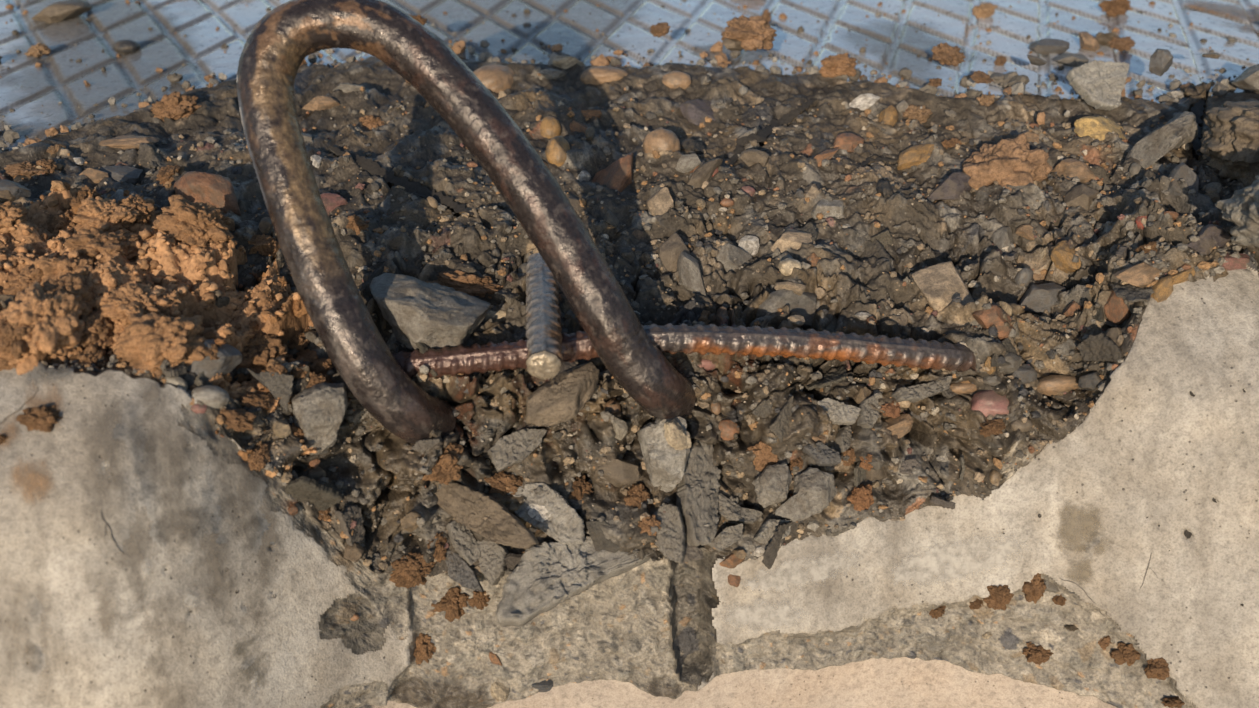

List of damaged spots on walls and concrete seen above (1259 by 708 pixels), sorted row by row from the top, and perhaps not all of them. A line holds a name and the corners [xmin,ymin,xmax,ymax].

spalling [0,79,299,308]
spalling [60,358,213,396]
damp [125,385,232,606]
spalling [178,55,1259,708]